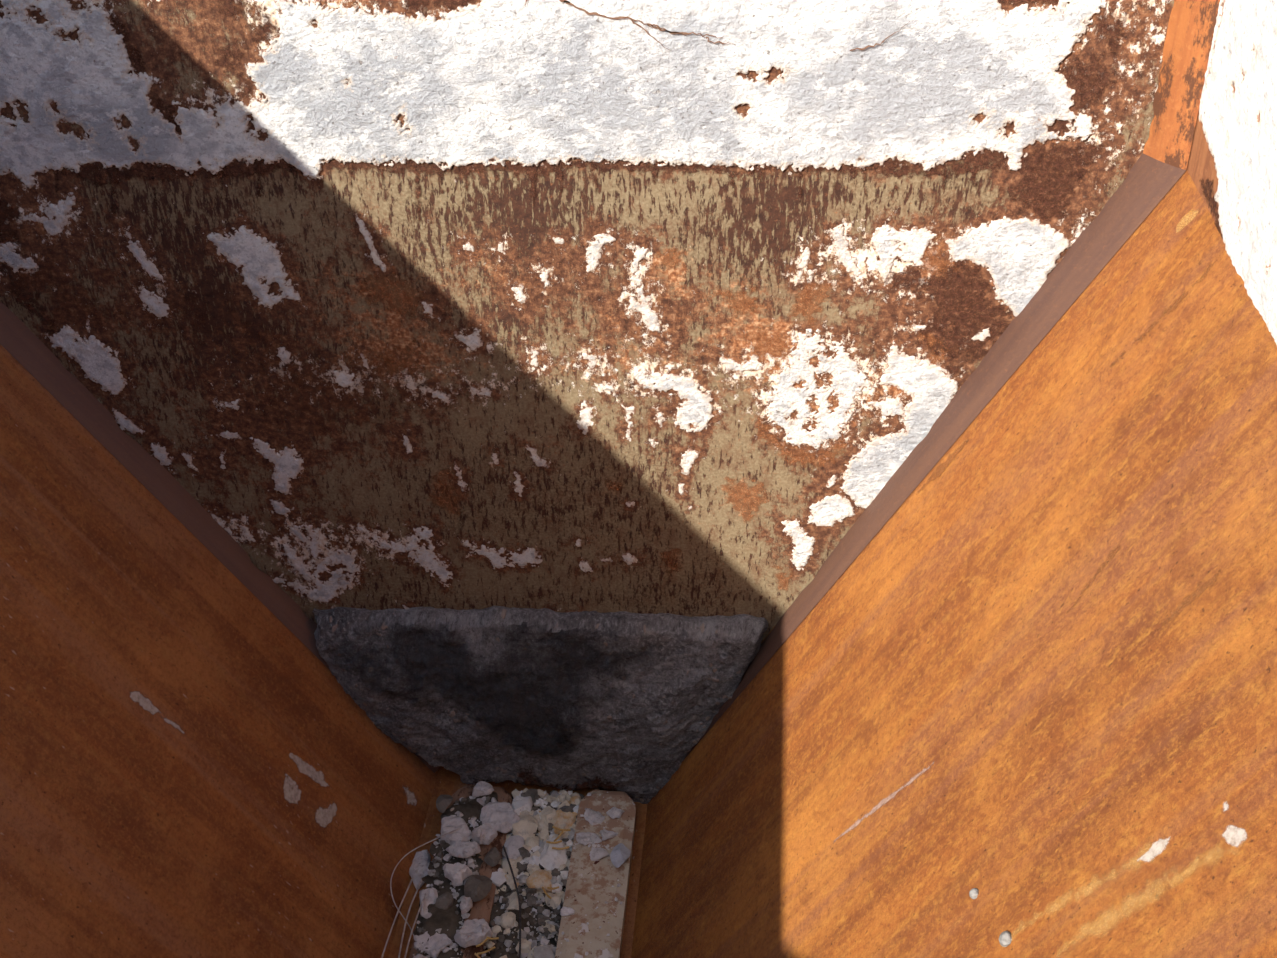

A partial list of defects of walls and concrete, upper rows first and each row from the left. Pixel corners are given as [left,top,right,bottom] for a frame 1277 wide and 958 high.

peeling [0,0,1107,189]
rust [320,12,1127,221]
peeling [45,319,198,471]
rust [53,159,298,214]
peeling [203,225,302,309]
peeling [633,368,714,448]
rust [743,328,788,363]
peeling [763,328,958,571]
rust [885,235,1012,375]
peeling [830,216,1085,317]
rust [1200,179,1223,239]
damp [348,622,643,761]